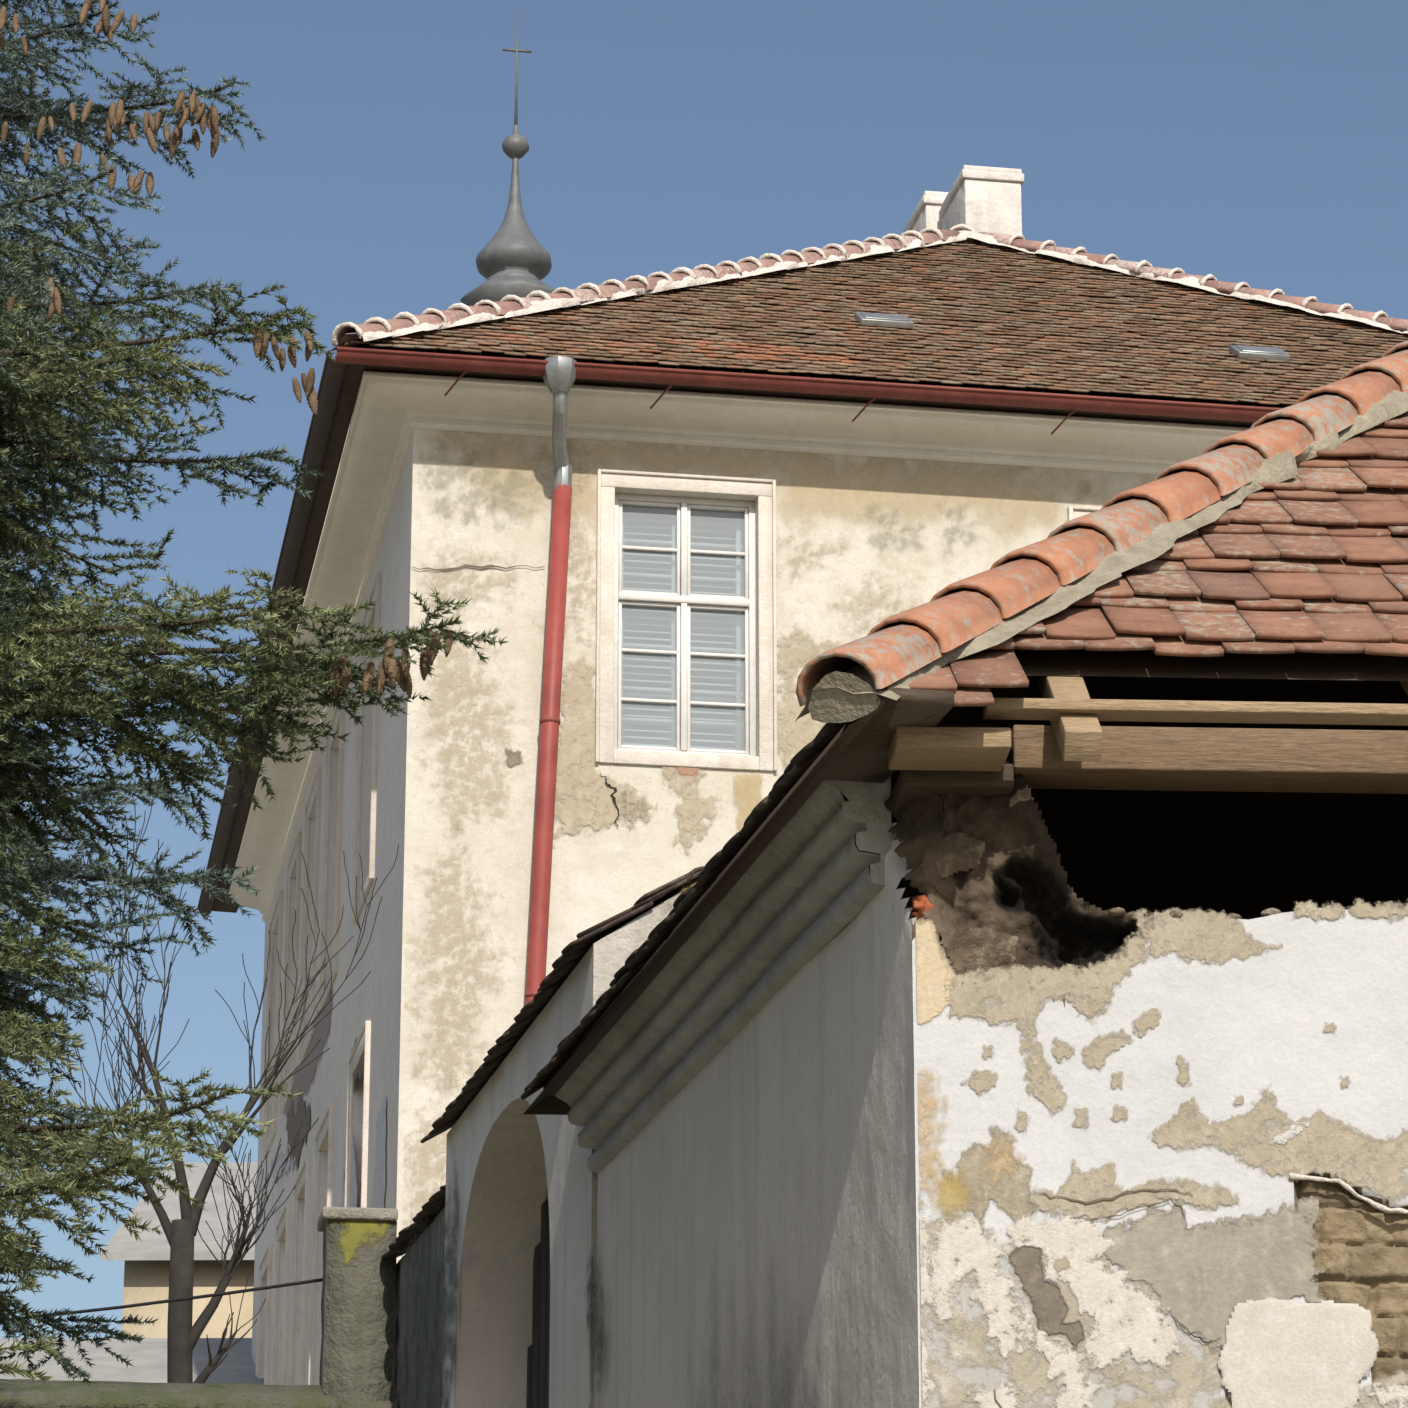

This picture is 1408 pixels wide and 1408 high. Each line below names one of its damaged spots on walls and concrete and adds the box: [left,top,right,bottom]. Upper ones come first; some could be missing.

crack [412,563,545,571]
peeling [777,628,842,767]
spalling [1261,898,1408,922]
peeling [915,907,1283,1127]
damp [391,1173,462,1408]
damp [587,1257,605,1408]
peeling [918,1055,1408,1408]